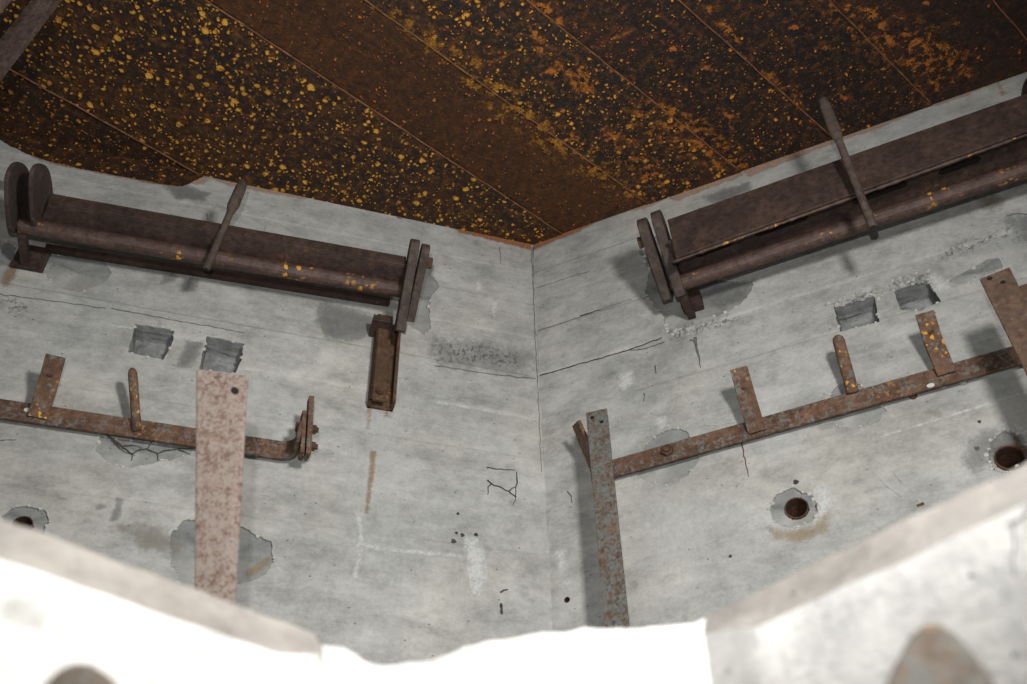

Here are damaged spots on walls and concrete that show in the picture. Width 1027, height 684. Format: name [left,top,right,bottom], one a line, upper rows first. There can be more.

corrosion [531,1,563,25]
corrosion [839,4,981,105]
corrosion [390,9,913,210]
corrosion [189,176,305,199]
spalling [946,255,1005,285]
damp [320,306,372,337]
crack [107,435,194,461]
spalling [644,427,690,451]
spalling [974,427,1027,473]
spalling [638,455,700,487]
spalling [2,504,51,533]
spalling [767,480,822,531]